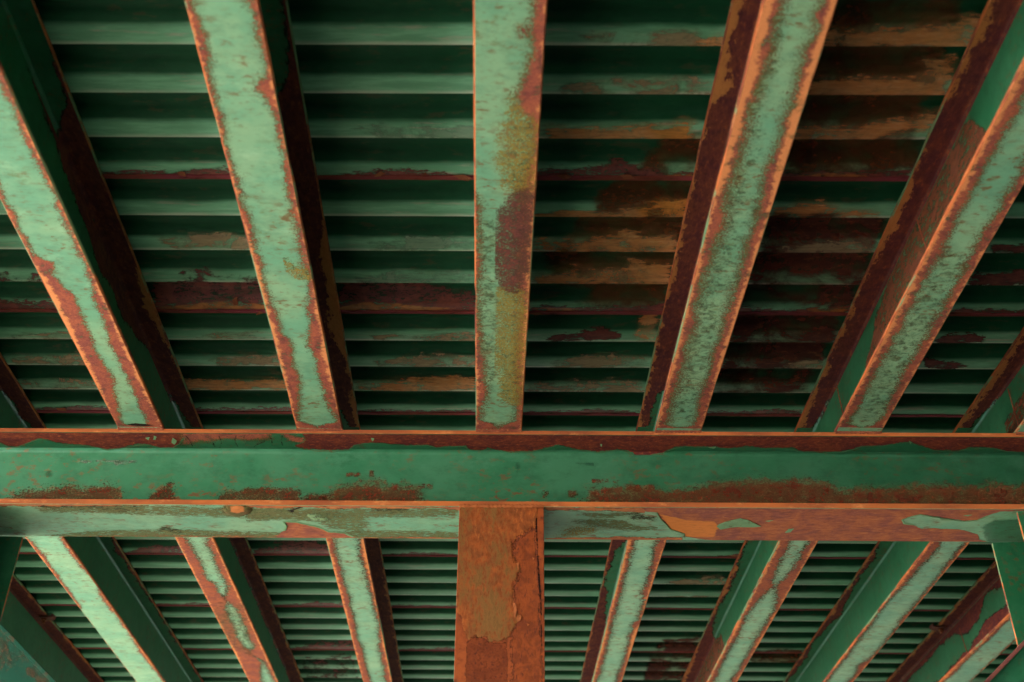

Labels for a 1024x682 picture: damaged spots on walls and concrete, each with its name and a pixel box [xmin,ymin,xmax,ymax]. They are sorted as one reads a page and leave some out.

rust [0,0,1024,447]
peeling [0,432,185,465]
rust [0,480,177,507]
rust [192,470,459,510]
rust [542,470,1024,513]
peeling [644,508,1024,542]
peeling [457,507,538,643]
rust [888,563,1011,682]